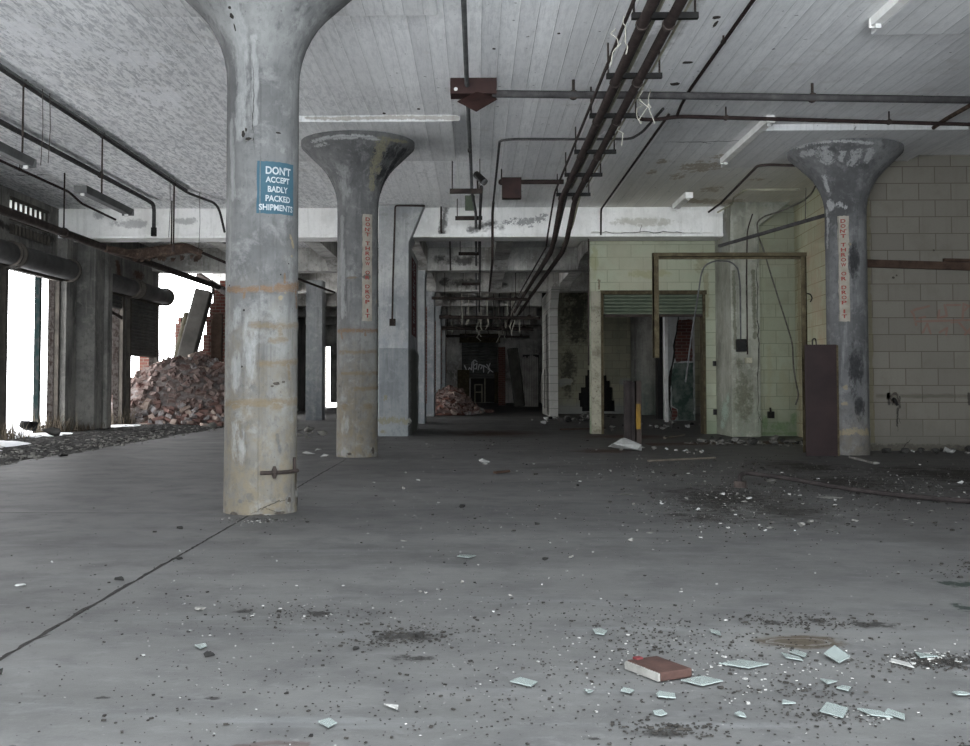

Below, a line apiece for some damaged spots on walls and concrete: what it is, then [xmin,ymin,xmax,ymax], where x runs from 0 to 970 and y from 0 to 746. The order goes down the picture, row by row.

peeling [310,133,409,320]
peeling [789,139,876,249]
damp [848,236,860,284]
peeling [379,295,407,345]
peeling [671,319,694,421]
peeling [339,411,352,457]